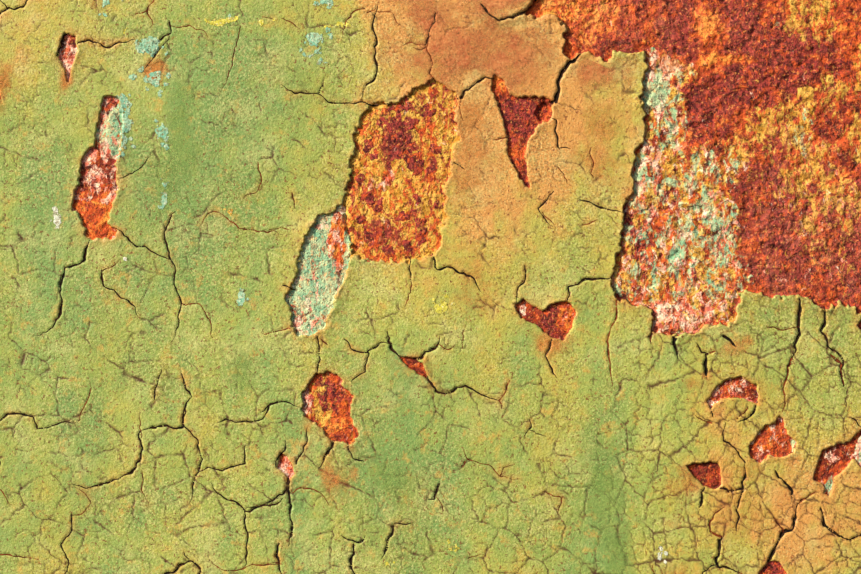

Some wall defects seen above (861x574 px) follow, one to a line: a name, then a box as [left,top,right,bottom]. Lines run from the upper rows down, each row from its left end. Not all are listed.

rust [409,0,548,87]
peeling [286,79,460,336]
peeling [492,75,553,188]
crack [538,53,594,227]
peeling [526,0,861,336]
crack [317,330,510,409]
peeling [515,299,576,341]
crack [768,298,844,412]
crack [60,370,365,574]
crack [695,405,756,574]
crack [767,470,861,562]
peeling [813,431,861,496]